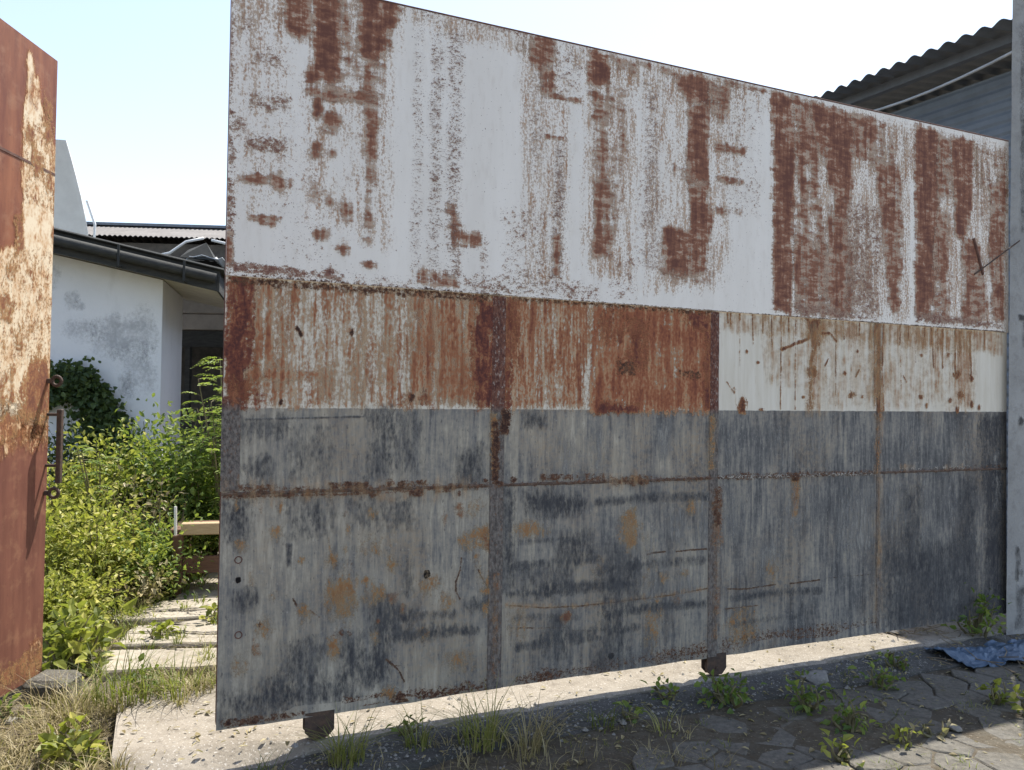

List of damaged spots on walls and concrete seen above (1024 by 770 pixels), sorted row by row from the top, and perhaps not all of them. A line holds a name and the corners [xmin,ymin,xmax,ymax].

corrosion [223,0,1009,706]
corrosion [220,711,305,728]